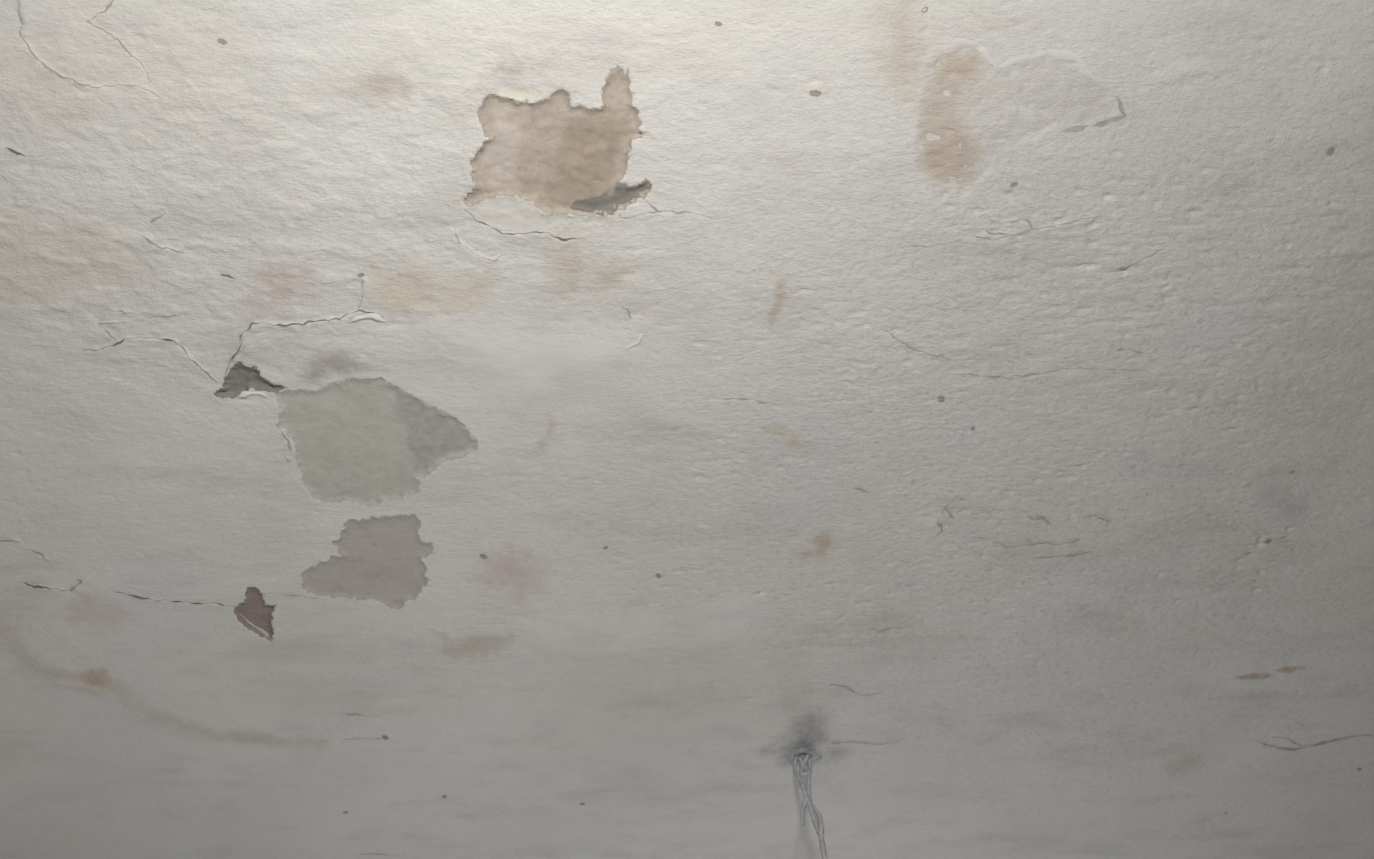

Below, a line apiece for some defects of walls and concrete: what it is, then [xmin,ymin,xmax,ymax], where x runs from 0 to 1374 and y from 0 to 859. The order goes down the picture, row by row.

crack [18,0,160,98]
damp [661,0,946,122]
flaking render [463,67,652,234]
peeling [903,37,1131,205]
crack [911,217,1093,247]
crack [83,267,386,383]
peeling [214,341,478,609]
peeling [234,587,276,641]
crack [1259,735,1374,751]